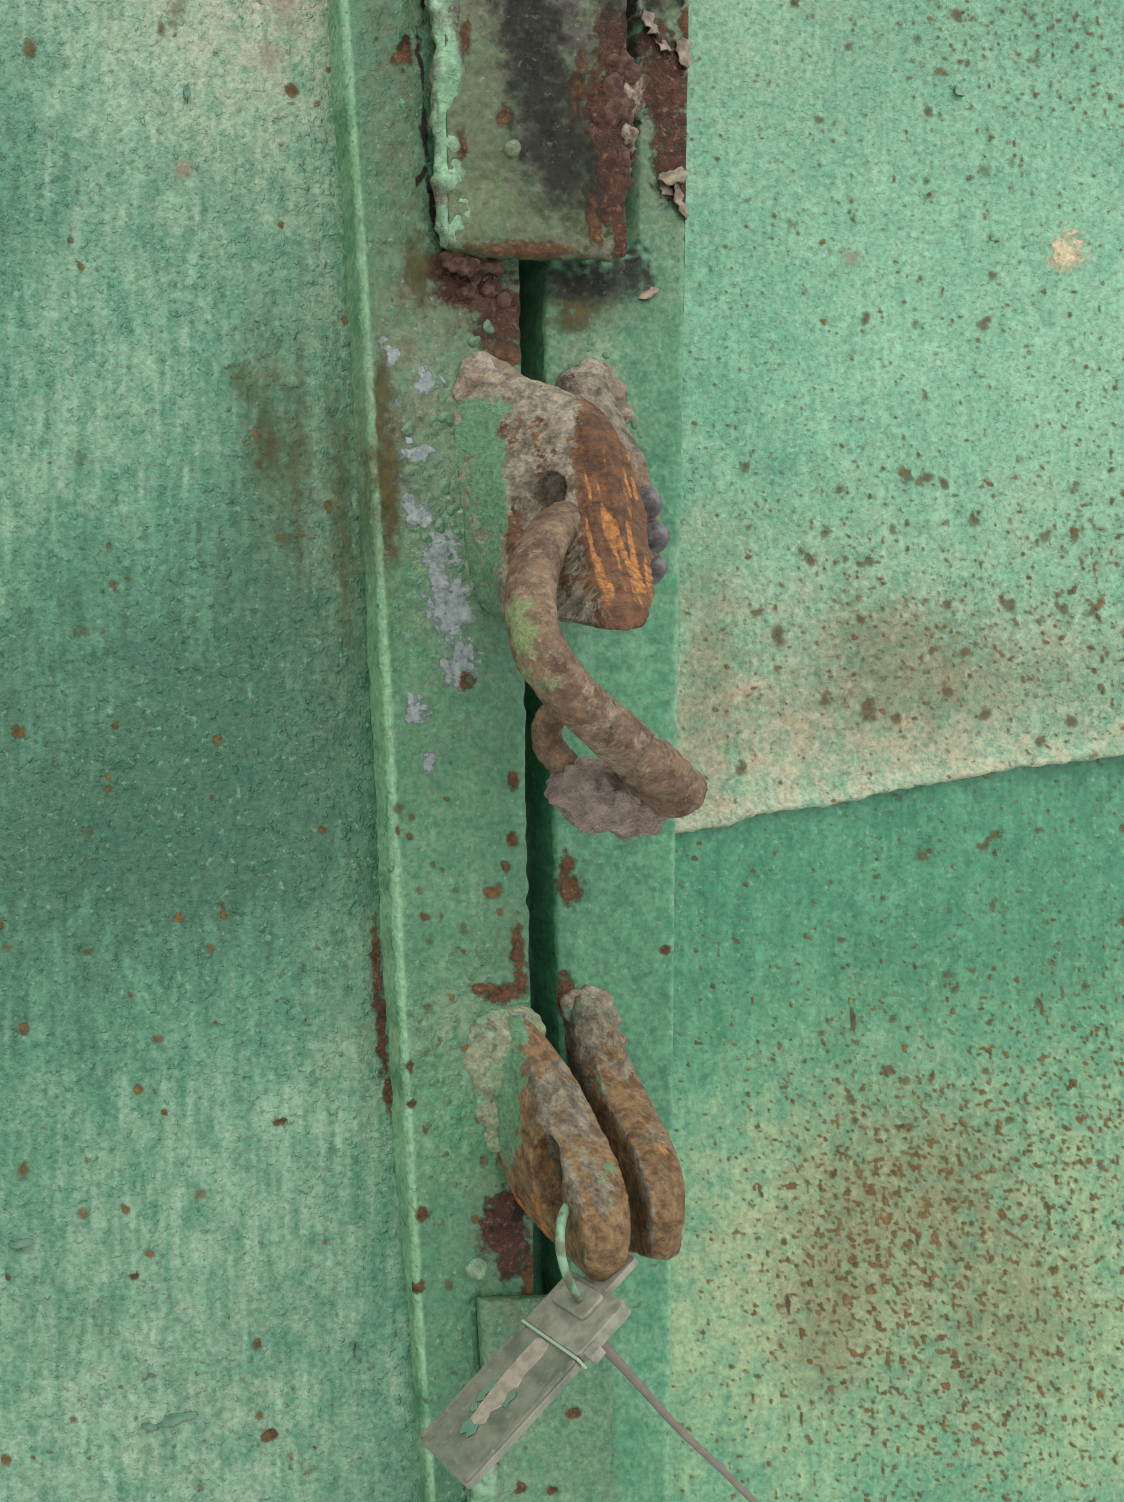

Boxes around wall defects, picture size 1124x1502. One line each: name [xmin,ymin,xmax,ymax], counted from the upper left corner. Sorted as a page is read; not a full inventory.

peeling [641,8,693,69]
corrosion [407,0,689,366]
peeling [657,166,691,220]
peeling [638,286,659,299]
peeling [376,335,401,369]
peeling [413,364,446,395]
corrosion [899,467,948,487]
peeling [379,437,485,774]
corrosion [554,848,584,905]
corrosion [472,912,530,1004]
corrosion [465,1185,534,1295]